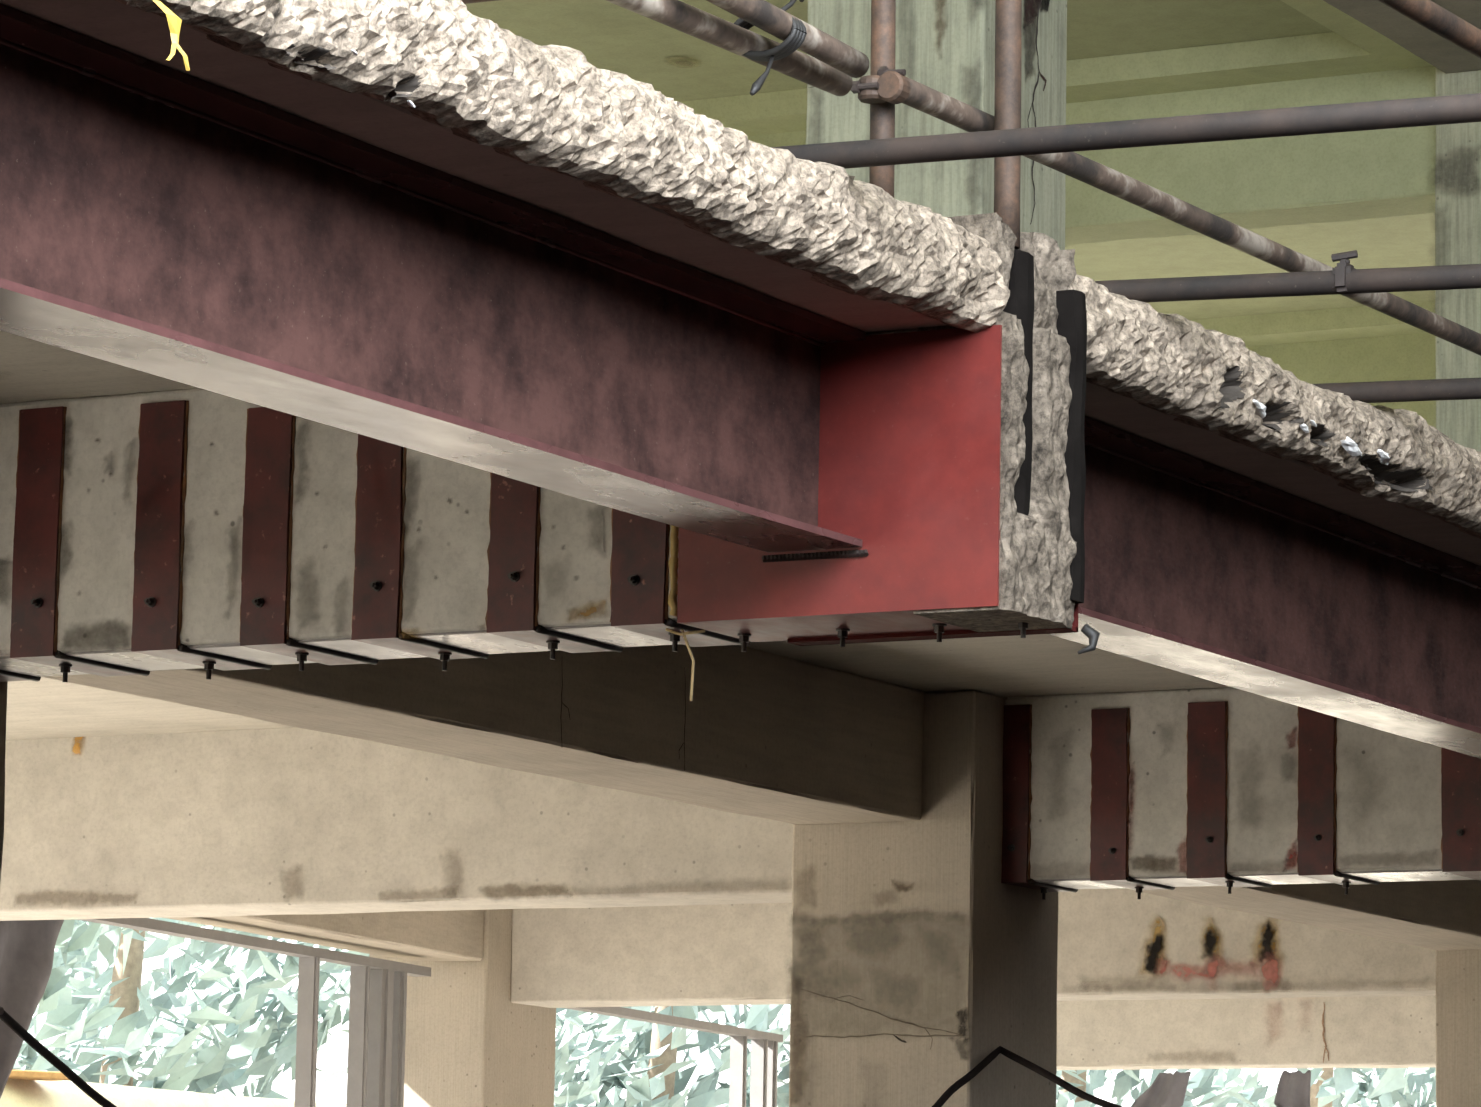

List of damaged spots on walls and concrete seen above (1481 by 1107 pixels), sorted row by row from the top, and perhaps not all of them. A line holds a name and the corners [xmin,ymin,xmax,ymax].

spalling [1068,274,1481,539]